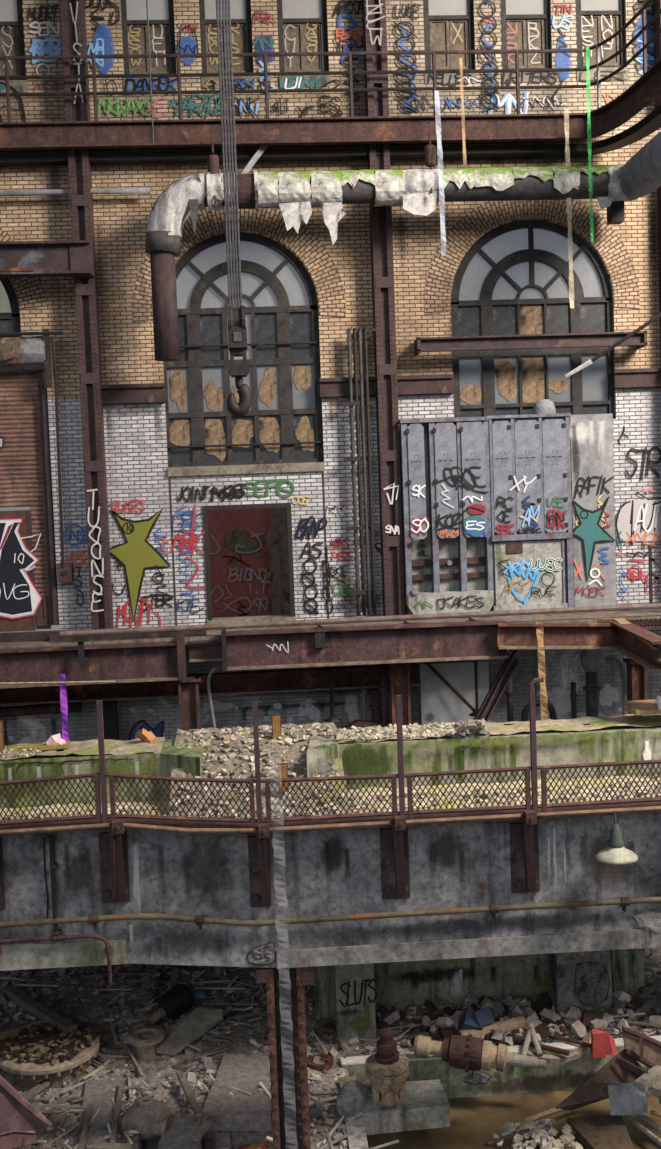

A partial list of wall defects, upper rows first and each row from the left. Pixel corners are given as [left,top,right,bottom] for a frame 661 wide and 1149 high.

water stain [628,731,661,760]